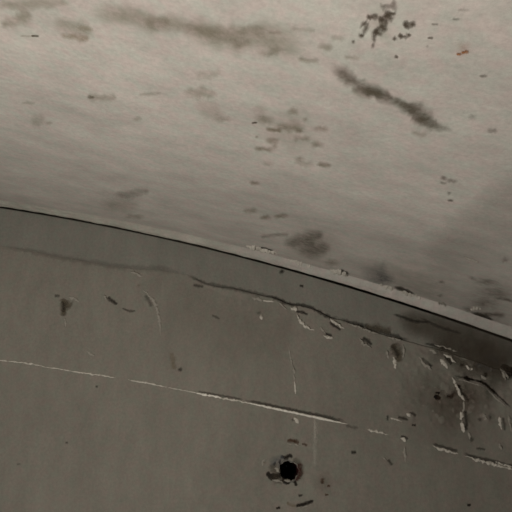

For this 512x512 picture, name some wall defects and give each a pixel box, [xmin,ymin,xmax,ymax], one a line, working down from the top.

mould [360,13,394,46]
damp [340,72,381,97]
peeling [252,296,405,369]
crack [0,360,115,378]
peeling [430,344,473,371]
crack [128,379,346,446]
crack [452,377,506,439]
crack [434,446,512,470]